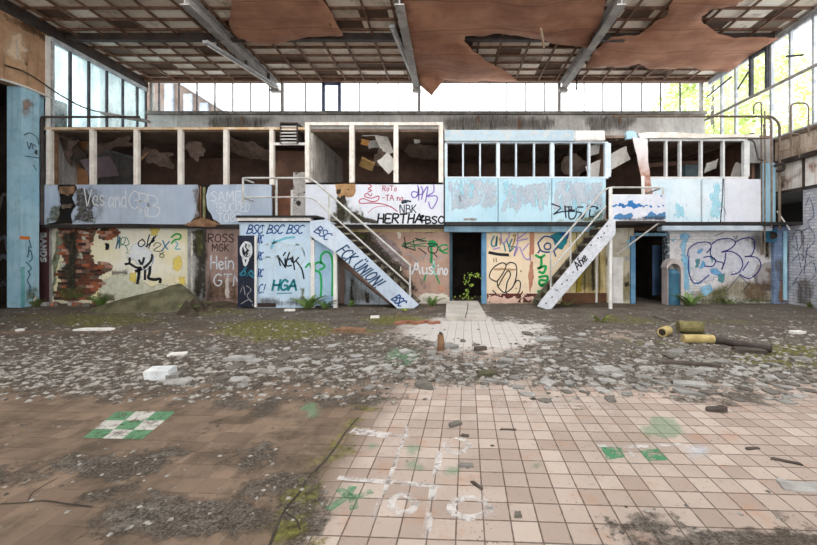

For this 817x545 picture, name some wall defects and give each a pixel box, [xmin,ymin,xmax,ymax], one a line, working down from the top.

peeling [448,178,602,212]
peeling [590,195,685,246]
flaking render [52,228,121,302]